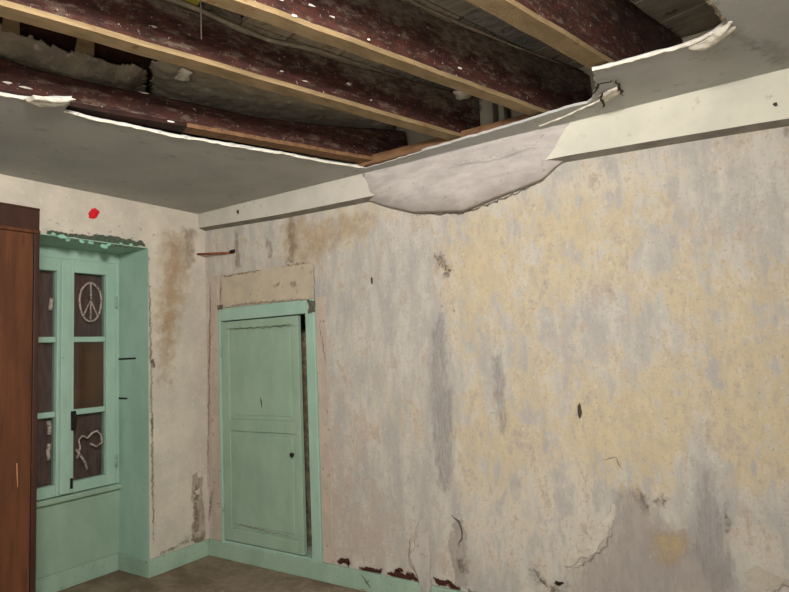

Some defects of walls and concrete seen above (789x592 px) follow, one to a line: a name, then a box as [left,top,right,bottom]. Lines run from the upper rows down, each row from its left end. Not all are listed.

spalling [592,0,736,71]
spalling [0,81,364,168]
spalling [0,23,395,130]
spalling [453,90,472,101]
spalling [539,80,624,127]
spalling [433,577,476,592]